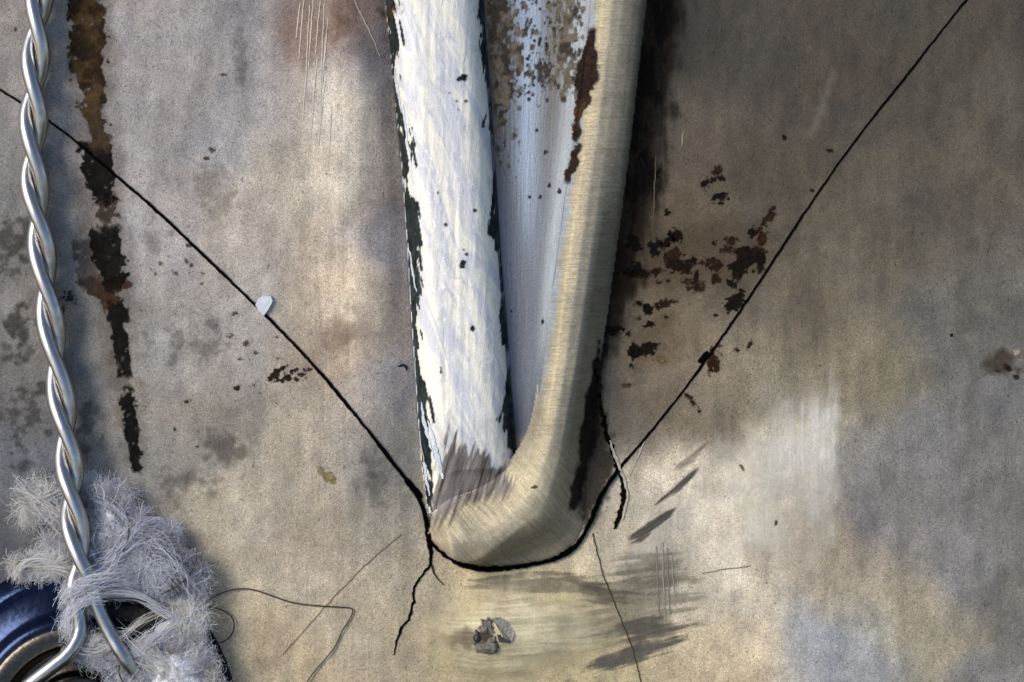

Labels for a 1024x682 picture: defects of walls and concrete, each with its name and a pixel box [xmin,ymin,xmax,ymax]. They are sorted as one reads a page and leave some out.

crack [0,89,21,104]
rust [66,0,143,472]
crack [48,119,257,308]
peeling [385,0,511,525]
peeling [496,367,516,455]
crack [264,0,968,682]
rust [564,0,777,522]